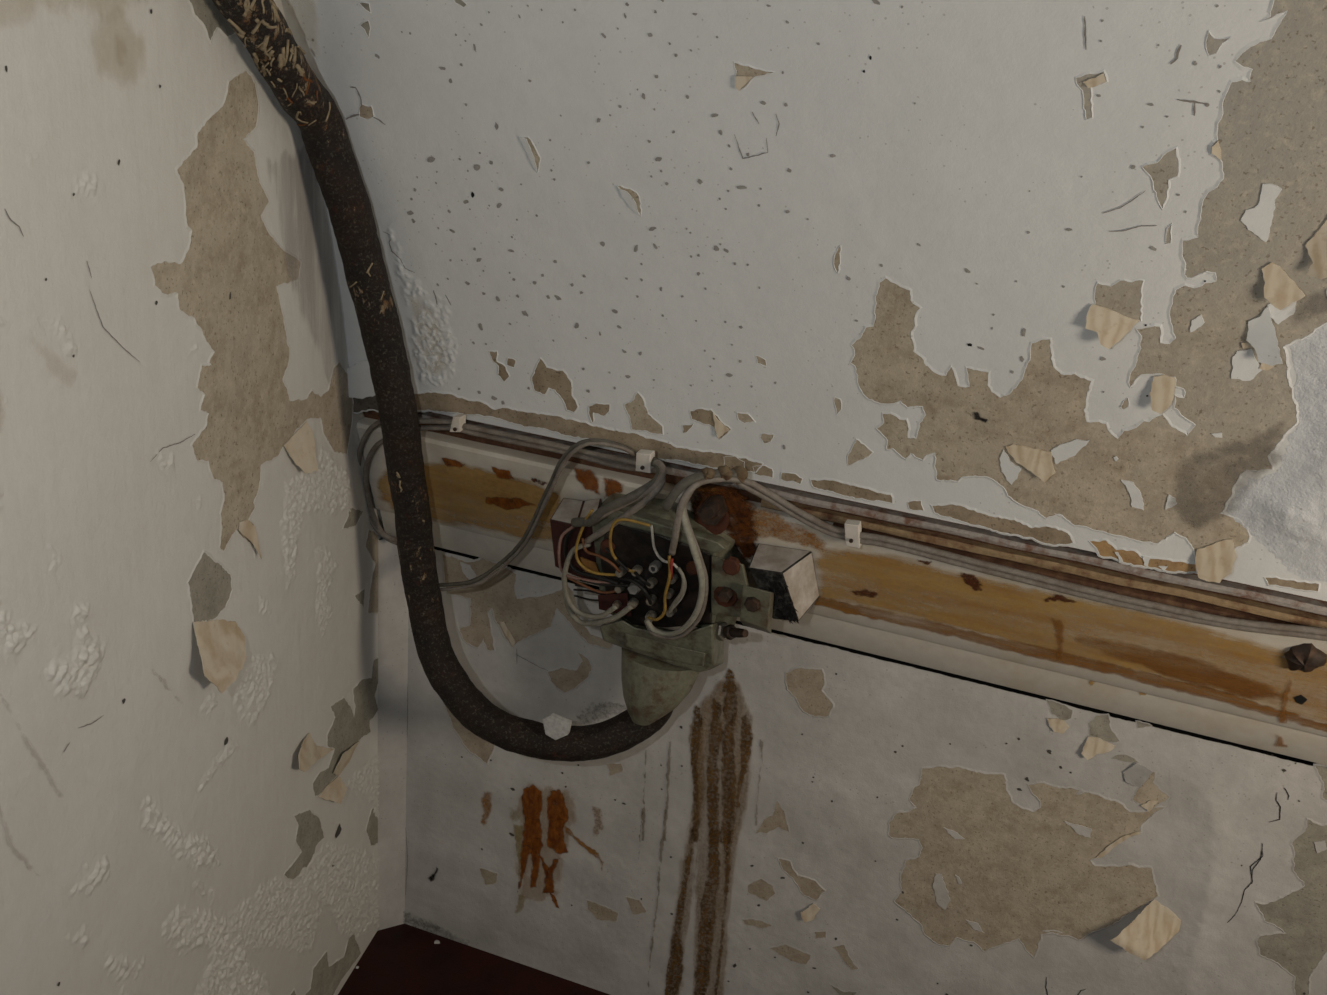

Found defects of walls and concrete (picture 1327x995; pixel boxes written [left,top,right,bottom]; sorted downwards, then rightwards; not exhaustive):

peeling [148,68,379,693]
peeling [414,0,1327,583]
rust [689,485,1327,747]
peeling [1262,575,1321,592]
peeling [289,931,361,995]
peeling [283,656,378,881]
rust [514,785,602,908]
peeling [887,699,1181,960]
peeling [1254,817,1327,995]
peeling [1313,763,1327,802]